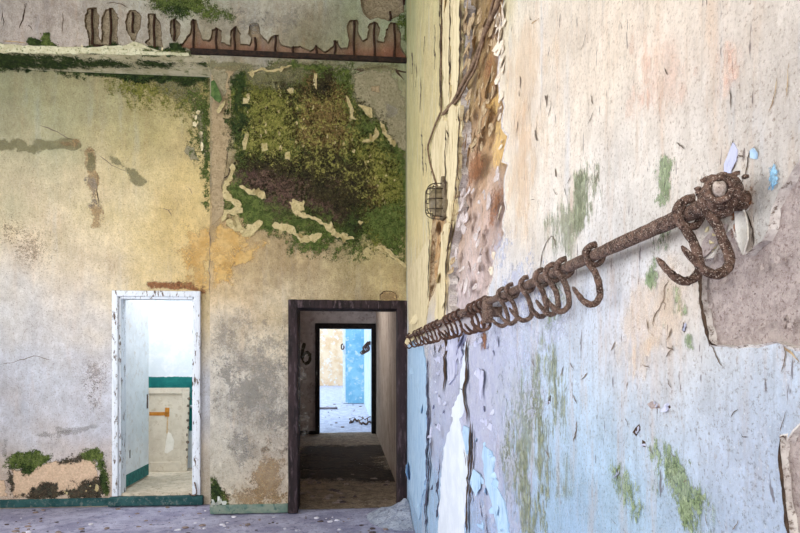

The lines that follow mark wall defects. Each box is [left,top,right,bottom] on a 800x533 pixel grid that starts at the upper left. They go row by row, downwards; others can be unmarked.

flaking render [0,0,407,57]
leakage [0,138,104,228]
leakage [110,157,147,186]
leakage [220,59,405,263]
rust [694,171,753,204]
flaking render [376,0,510,533]
flaking render [701,159,800,351]
peeling [0,459,100,498]
leakage [501,381,548,533]
leakage [676,494,708,528]
flaking render [780,423,800,533]